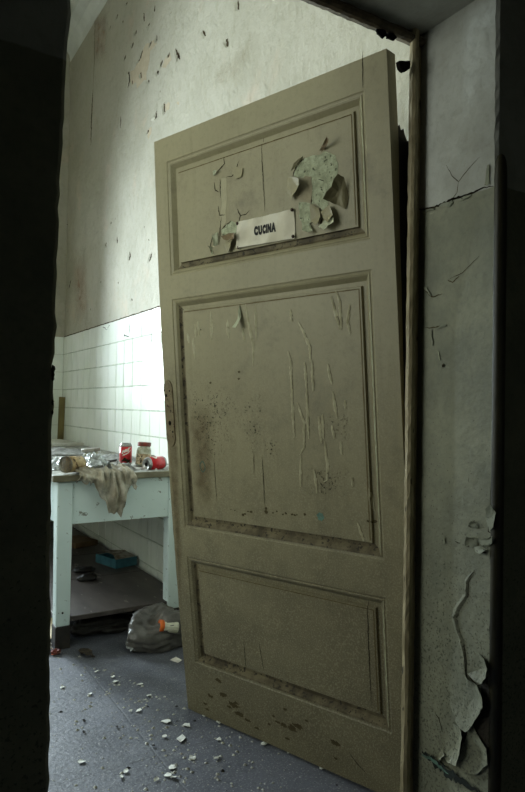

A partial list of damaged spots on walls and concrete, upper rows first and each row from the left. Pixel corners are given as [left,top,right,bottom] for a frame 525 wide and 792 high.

peeling [376,29,397,41]
peeling [126,37,180,88]
crack [419,163,493,212]
flaking render [455,505,496,554]
peeling [421,643,490,792]